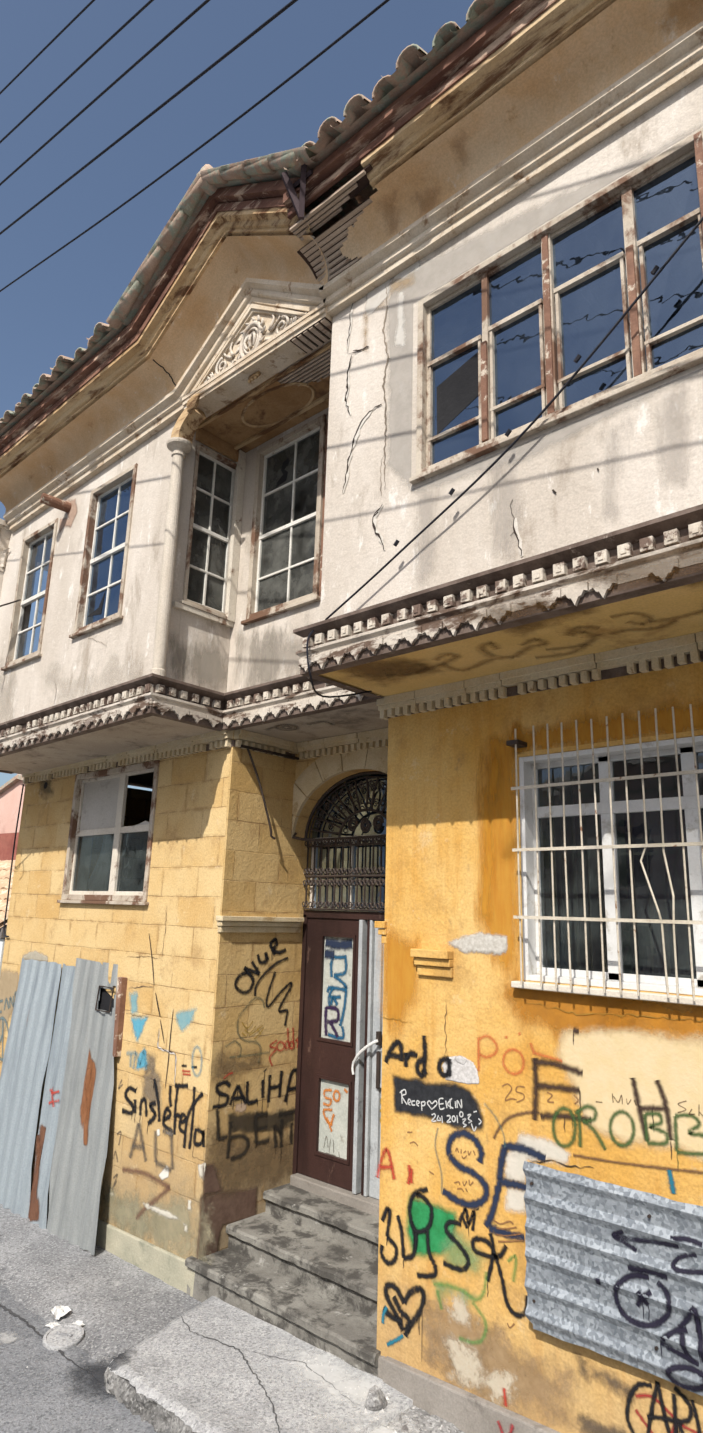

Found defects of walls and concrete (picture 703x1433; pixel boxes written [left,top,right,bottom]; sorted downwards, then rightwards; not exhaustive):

crack [342,286,389,550]
spalling [559,1030,703,1158]